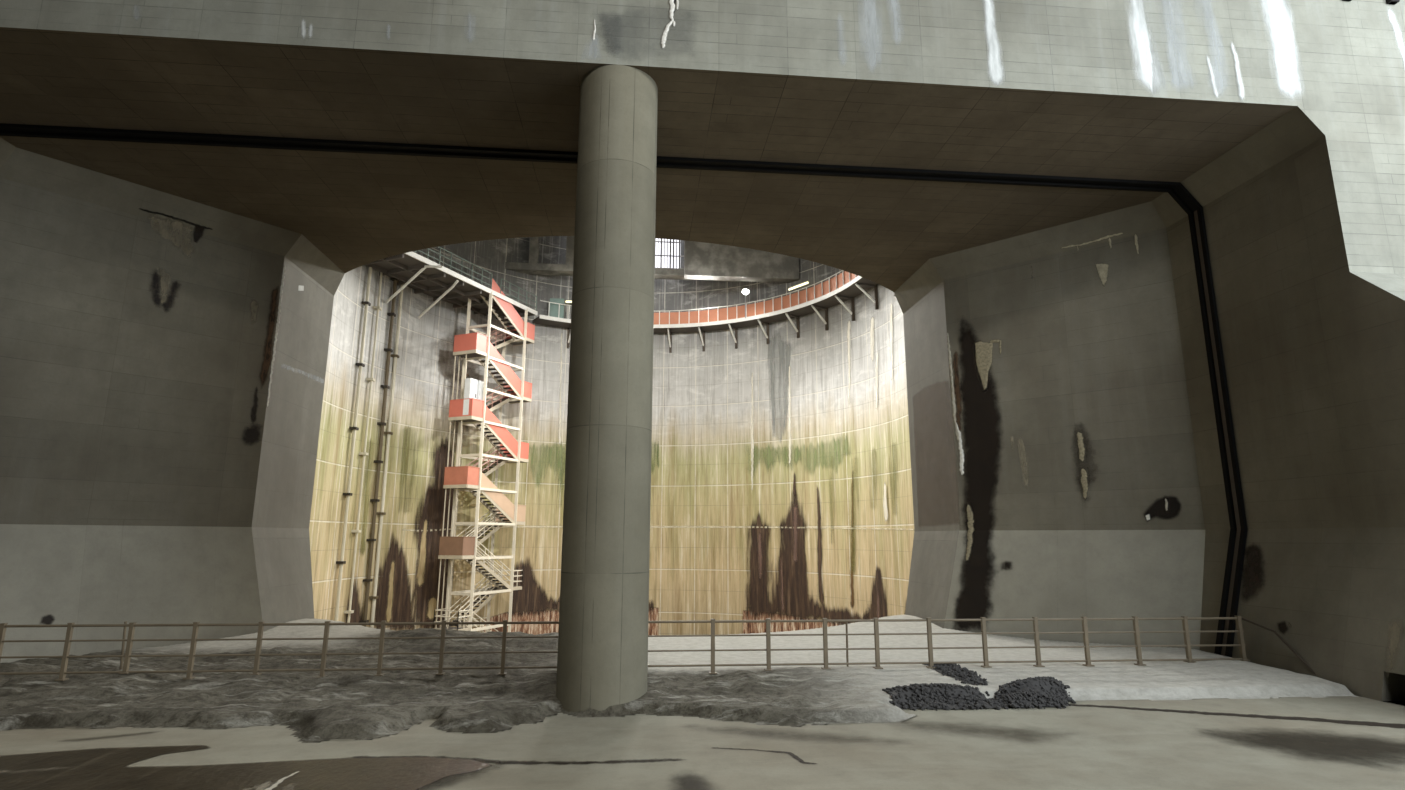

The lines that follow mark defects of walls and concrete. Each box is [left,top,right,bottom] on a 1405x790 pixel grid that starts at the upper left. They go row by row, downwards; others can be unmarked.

leakage [985,0,1003,84]
leakage [1131,0,1164,91]
leakage [1231,44,1244,98]
leakage [1263,0,1301,96]
leakage [1388,9,1405,65]
leakage [151,269,180,310]
leakage [440,330,478,399]
leakage [346,422,474,631]
leakage [650,337,913,625]
leakage [955,322,1028,631]
spalling [1144,496,1181,521]
leakage [512,560,560,616]